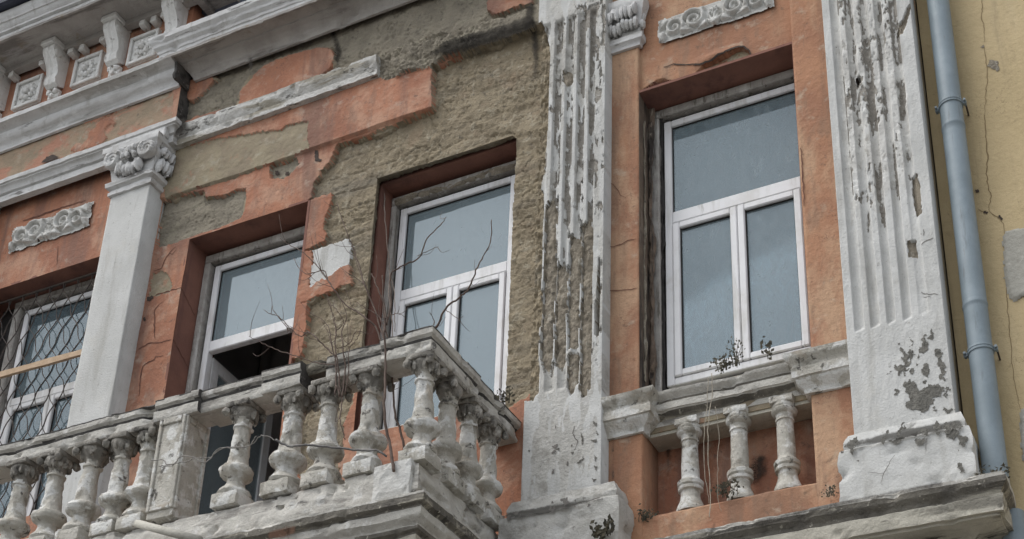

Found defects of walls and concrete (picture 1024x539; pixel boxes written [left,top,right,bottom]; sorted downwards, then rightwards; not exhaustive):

flaking render [187,0,539,121]
peeling [837,0,922,232]
crack [978,0,1005,234]
flaking render [156,121,310,247]
flaking render [294,0,606,408]
flaking render [907,240,918,258]
crack [138,247,195,396]
flaking render [298,403,321,476]
flaking render [337,393,354,447]
peeling [841,436,859,462]
peeling [881,329,968,473]